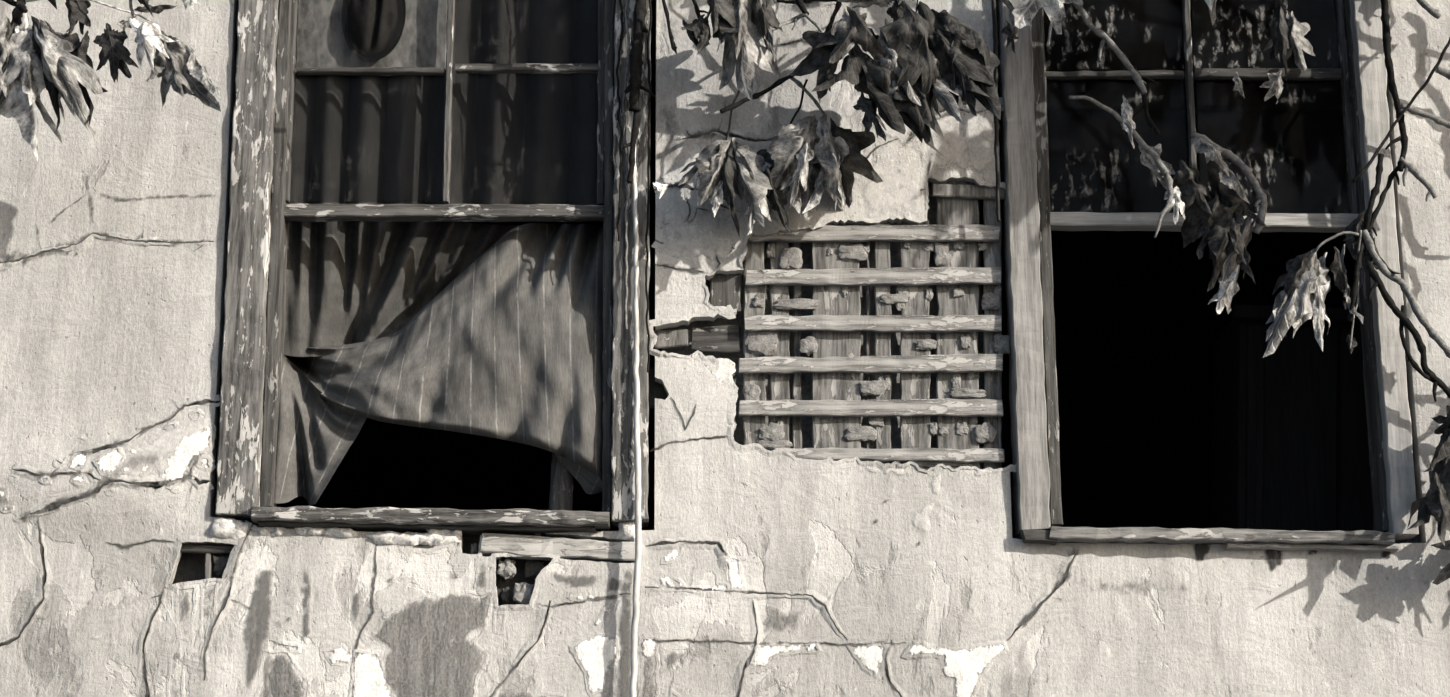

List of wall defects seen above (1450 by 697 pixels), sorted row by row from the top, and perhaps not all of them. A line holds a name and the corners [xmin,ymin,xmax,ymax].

crack [0,176,214,271]
spalling [648,94,1017,530]
peeling [38,408,216,497]
crack [0,394,220,651]
crack [136,585,167,697]
crack [197,520,257,681]
spalling [163,517,560,611]
peeling [567,592,623,697]
spalling [617,521,635,542]
crack [483,536,907,697]
peeling [845,640,1009,697]
crack [1004,550,1079,643]